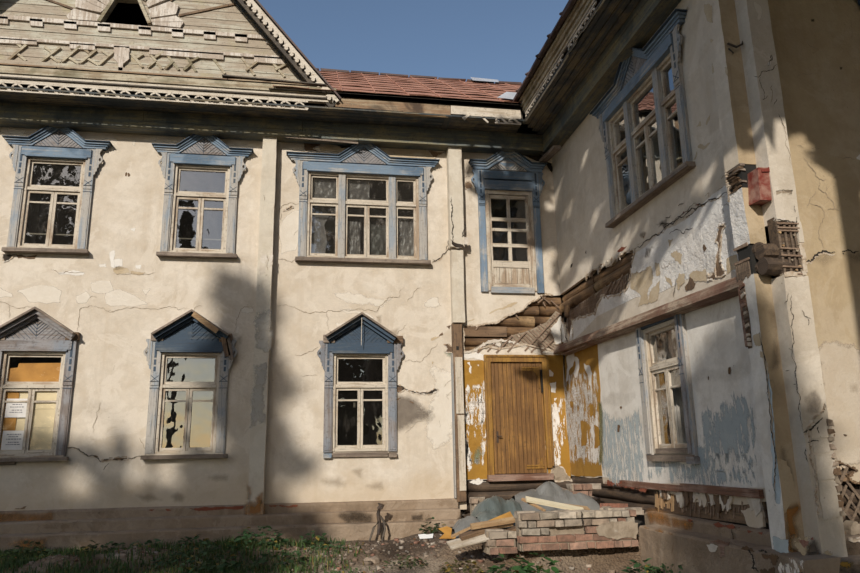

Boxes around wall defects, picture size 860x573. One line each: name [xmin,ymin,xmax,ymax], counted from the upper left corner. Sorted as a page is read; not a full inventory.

crack [754,55,858,264]
crack [433,199,464,262]
crack [280,287,421,377]
peeling [335,292,388,327]
peeling [431,223,738,373]
crack [67,440,145,469]
peeling [397,362,452,449]
peeling [464,381,486,485]
peeling [549,353,766,535]
spalling [836,461,860,485]
peeling [742,536,813,573]